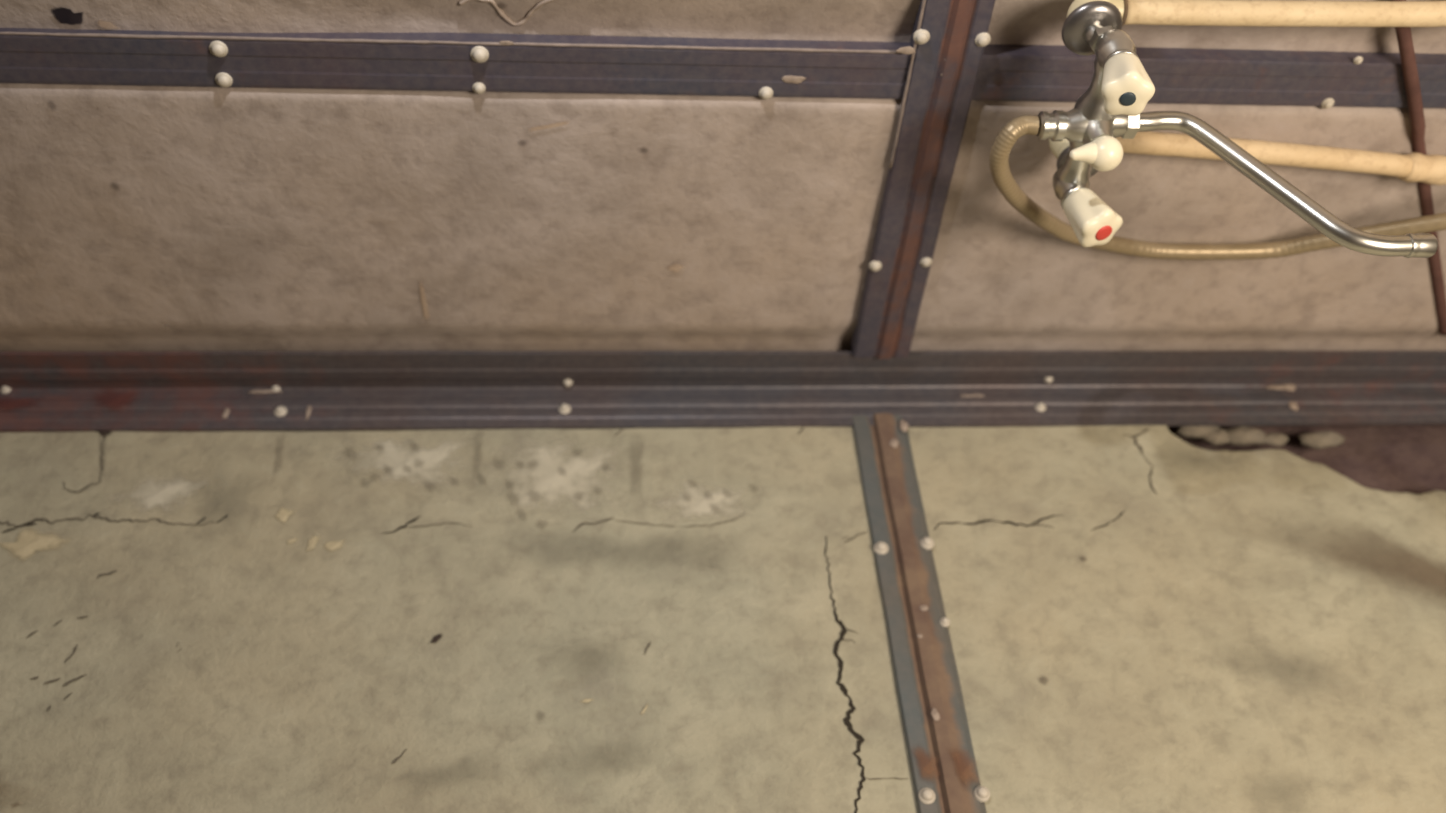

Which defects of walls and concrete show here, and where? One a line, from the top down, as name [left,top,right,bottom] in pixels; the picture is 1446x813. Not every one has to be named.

crack [0,438,228,533]
water stain [130,480,204,509]
water stain [361,441,458,484]
crack [385,516,468,533]
water stain [506,445,610,508]
crack [573,512,748,532]
water stain [658,486,742,517]
crack [934,515,1060,530]
crack [1123,429,1157,494]
crack [824,532,909,813]